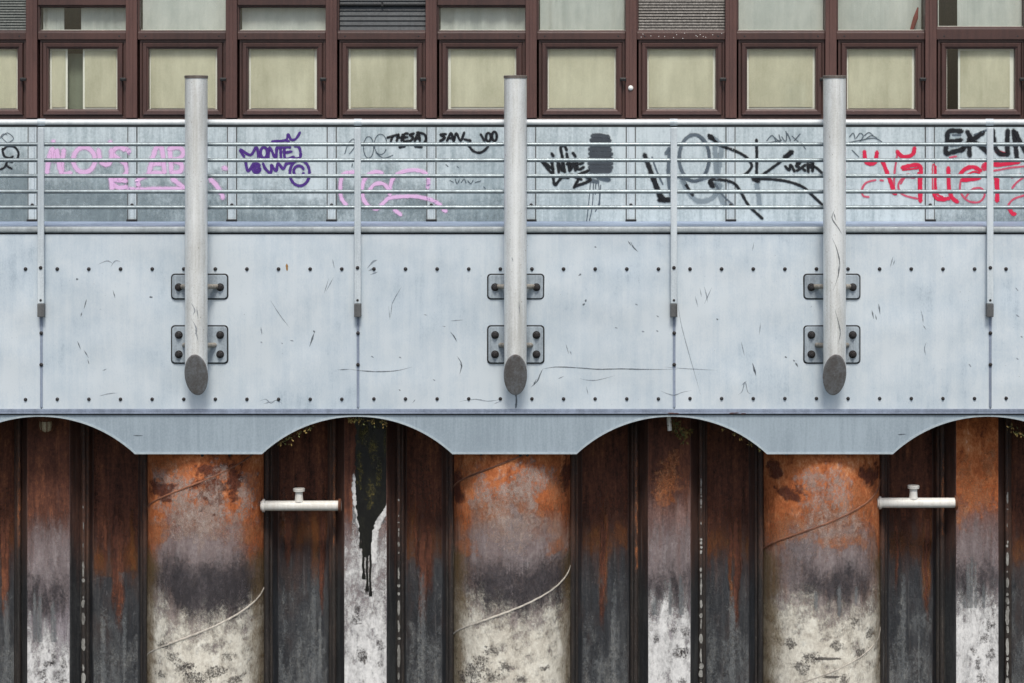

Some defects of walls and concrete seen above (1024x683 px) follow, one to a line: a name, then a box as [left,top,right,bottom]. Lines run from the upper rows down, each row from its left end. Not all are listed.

rust [0,417,69,614]
damp [27,554,264,683]
rust [94,428,264,622]
rust [279,417,357,605]
damp [344,506,570,683]
rust [407,413,690,618]
rust [707,421,749,622]
damp [763,554,932,683]
rust [764,429,944,611]
rust [956,417,998,529]
damp [956,541,1023,683]
rust [1012,419,1024,559]